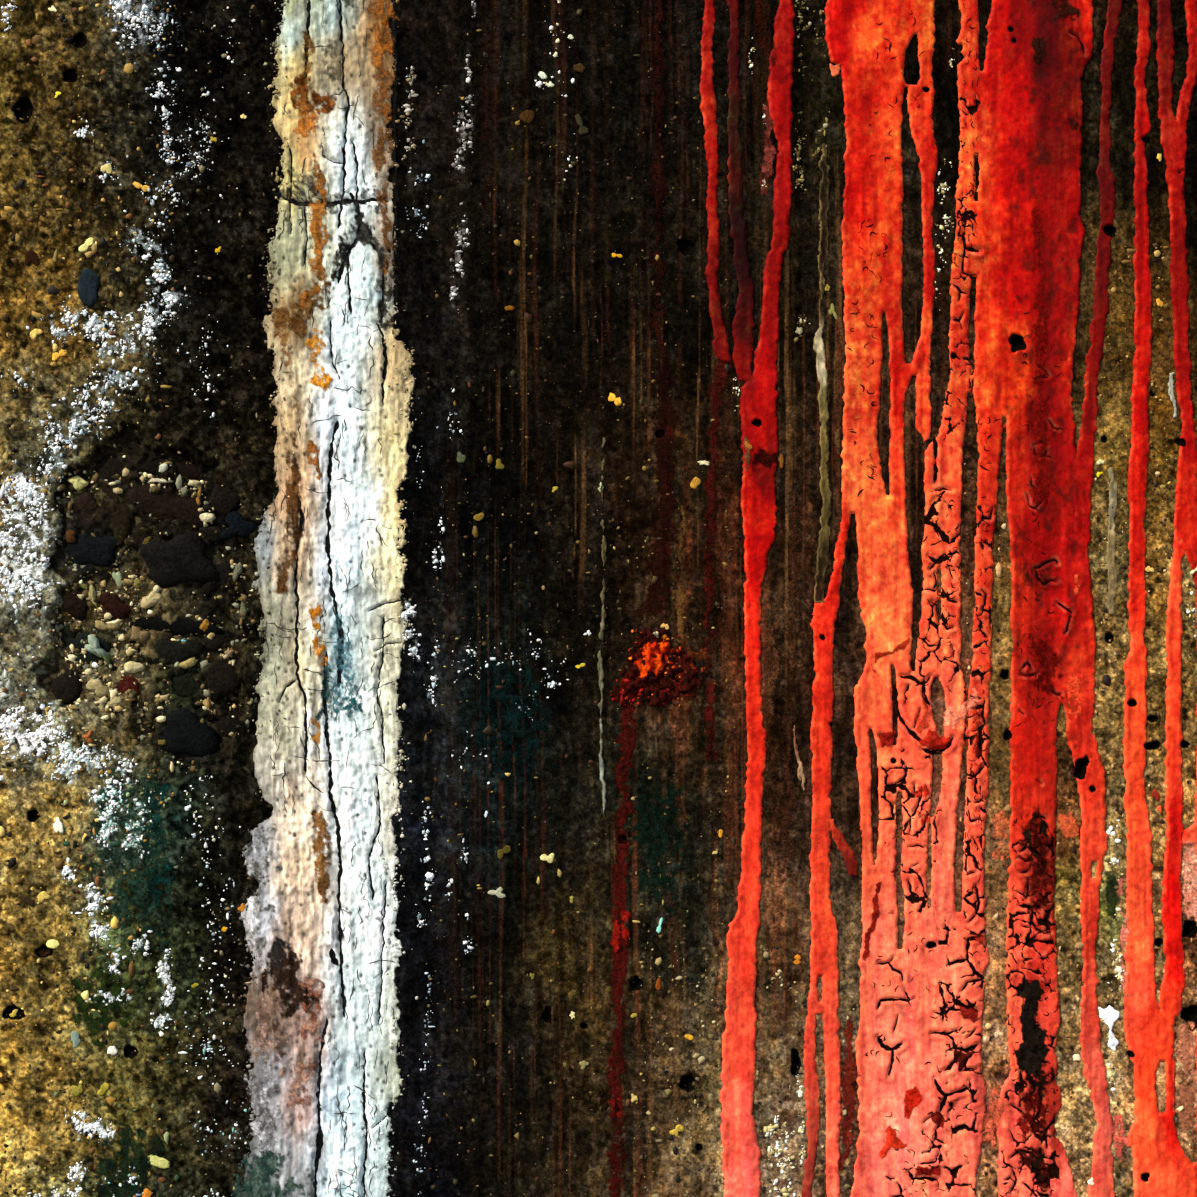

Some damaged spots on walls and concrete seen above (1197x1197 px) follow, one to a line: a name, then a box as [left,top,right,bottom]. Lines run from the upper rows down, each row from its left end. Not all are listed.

rust [289,31,335,137]
rust [367,0,397,274]
rust [271,153,333,390]
leakage [0,0,575,1197]
rust [276,432,322,593]
rust [310,718,321,743]
rust [308,605,328,665]
crack [264,0,404,1197]
crack [865,4,1072,1197]
rust [308,810,334,903]